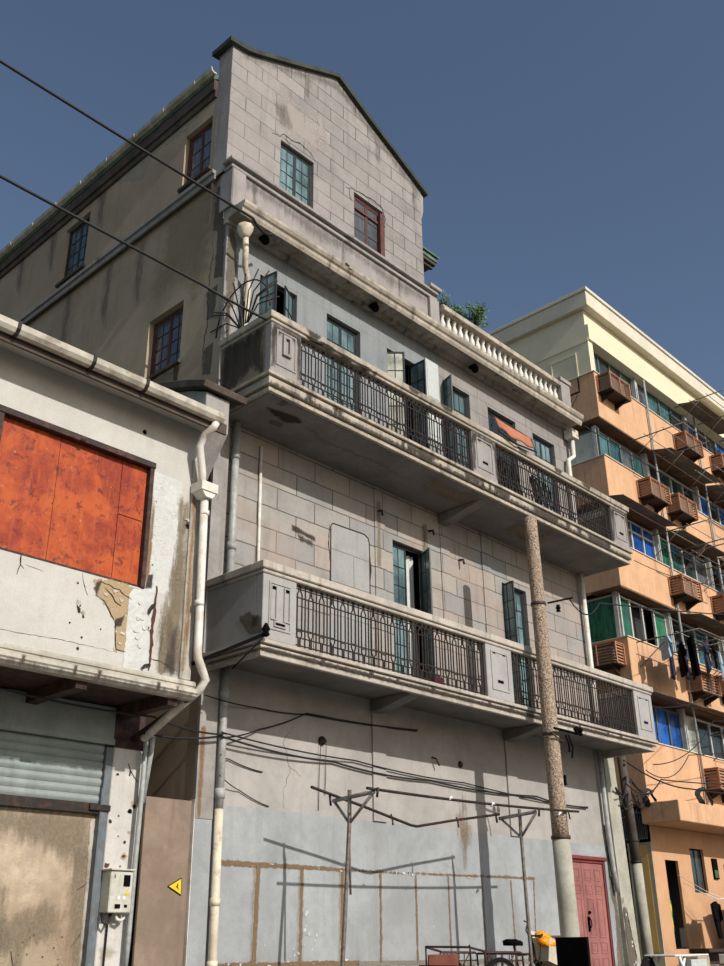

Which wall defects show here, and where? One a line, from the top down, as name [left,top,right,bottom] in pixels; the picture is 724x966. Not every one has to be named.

flaking render [93,579,138,652]
leakage [158,495,196,689]
flaking render [0,935,63,966]
flaking render [71,819,95,966]